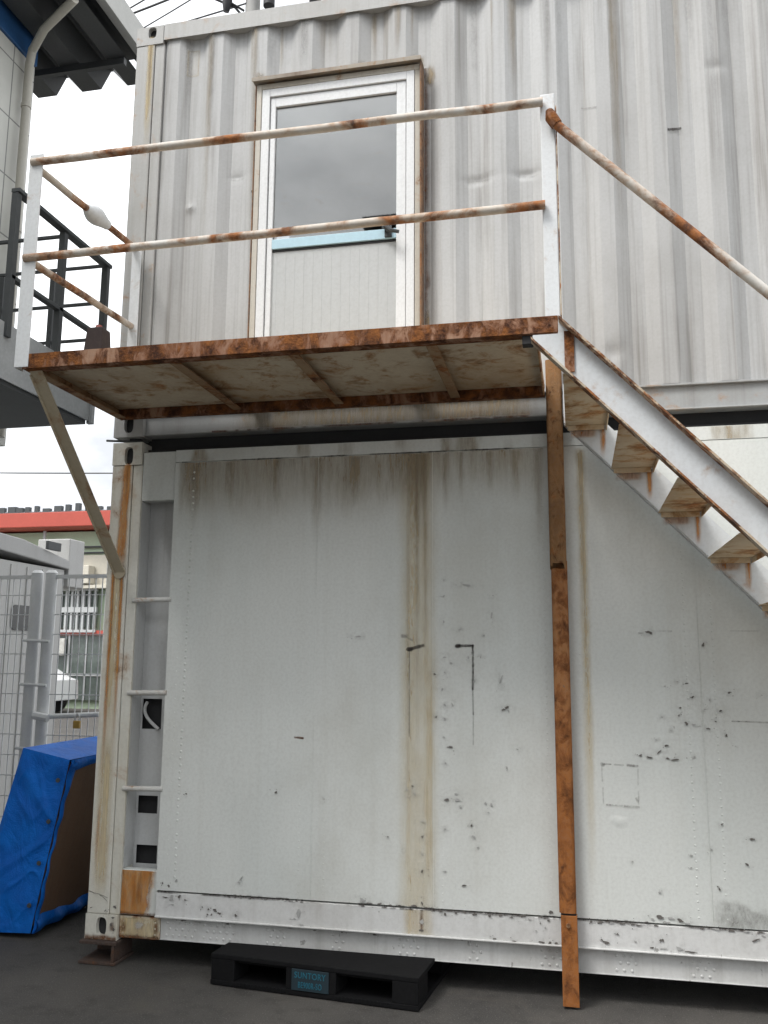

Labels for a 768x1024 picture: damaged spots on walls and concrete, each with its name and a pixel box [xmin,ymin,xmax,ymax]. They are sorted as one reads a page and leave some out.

corrosion [424,68,434,202]
corrosion [267,399,526,429]
corrosion [117,464,131,558]
corrosion [105,573,123,710]
corrosion [85,869,159,941]
peeling [360,897,558,944]
peeling [589,915,765,953]